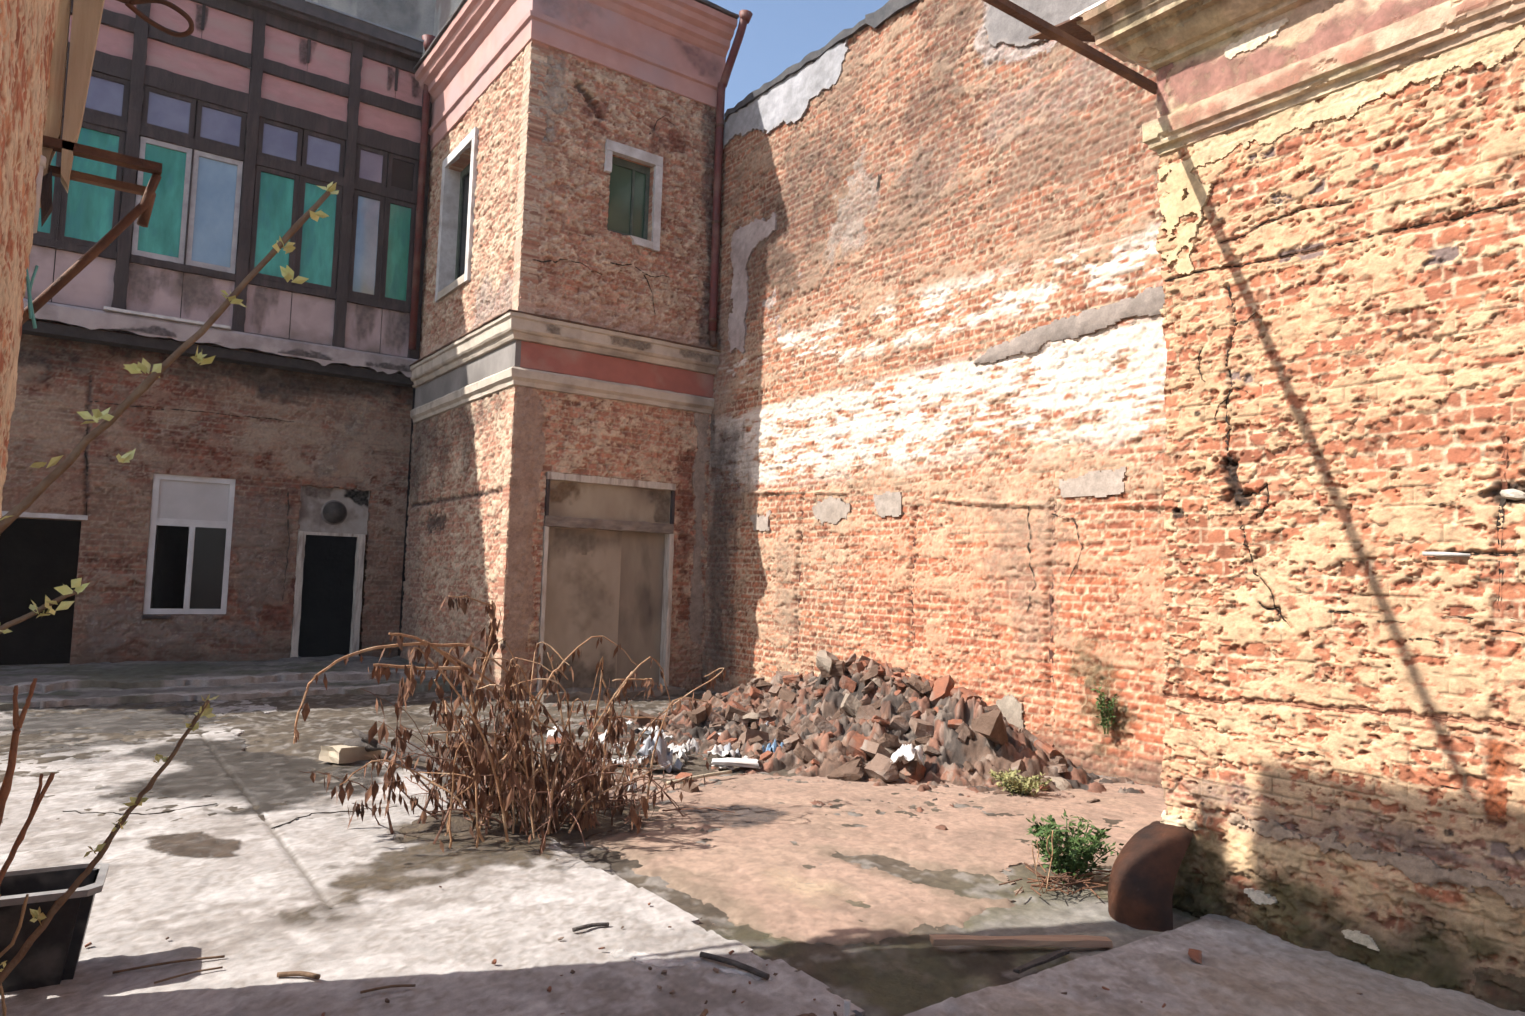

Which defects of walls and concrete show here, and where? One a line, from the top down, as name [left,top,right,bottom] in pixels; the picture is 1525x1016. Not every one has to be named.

peeling [1156,0,1444,127]
crack [1164,201,1525,642]
peeling [1059,466,1126,498]
peeling [750,510,772,531]
peeling [812,496,851,525]
peeling [874,491,904,518]